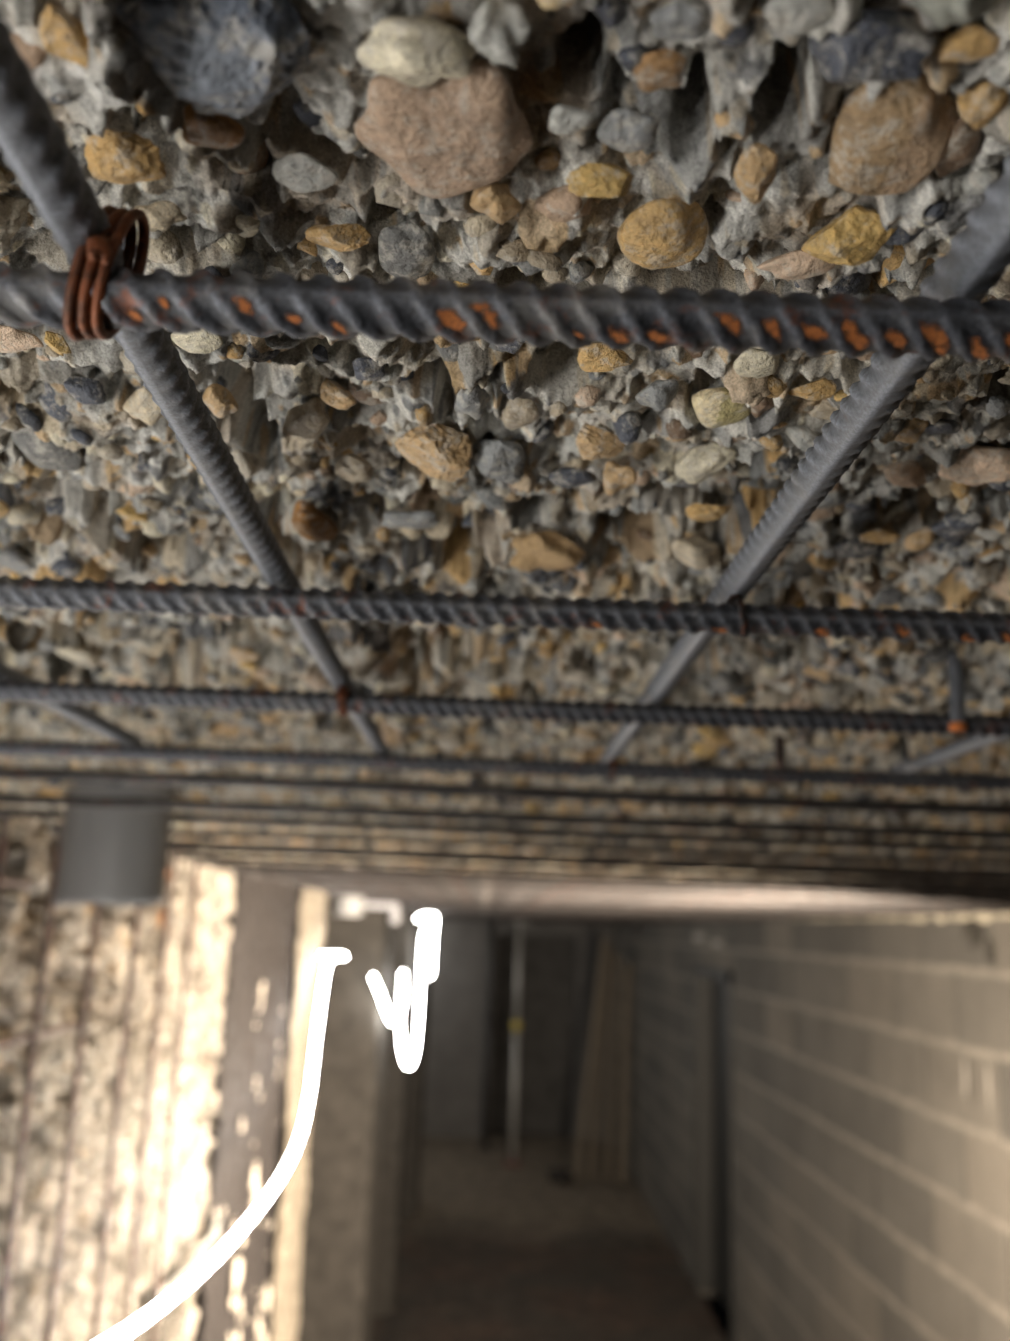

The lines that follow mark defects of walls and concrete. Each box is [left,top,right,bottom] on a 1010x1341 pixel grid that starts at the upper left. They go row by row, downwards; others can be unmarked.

rust [234,297,254,315]
rust [436,302,498,331]
rust [609,330,629,343]
rust [647,331,672,343]
rust [714,313,742,333]
rust [763,319,781,342]
rust [801,319,869,350]
rust [885,329,907,349]
rust [919,323,949,356]
rust [971,337,989,360]